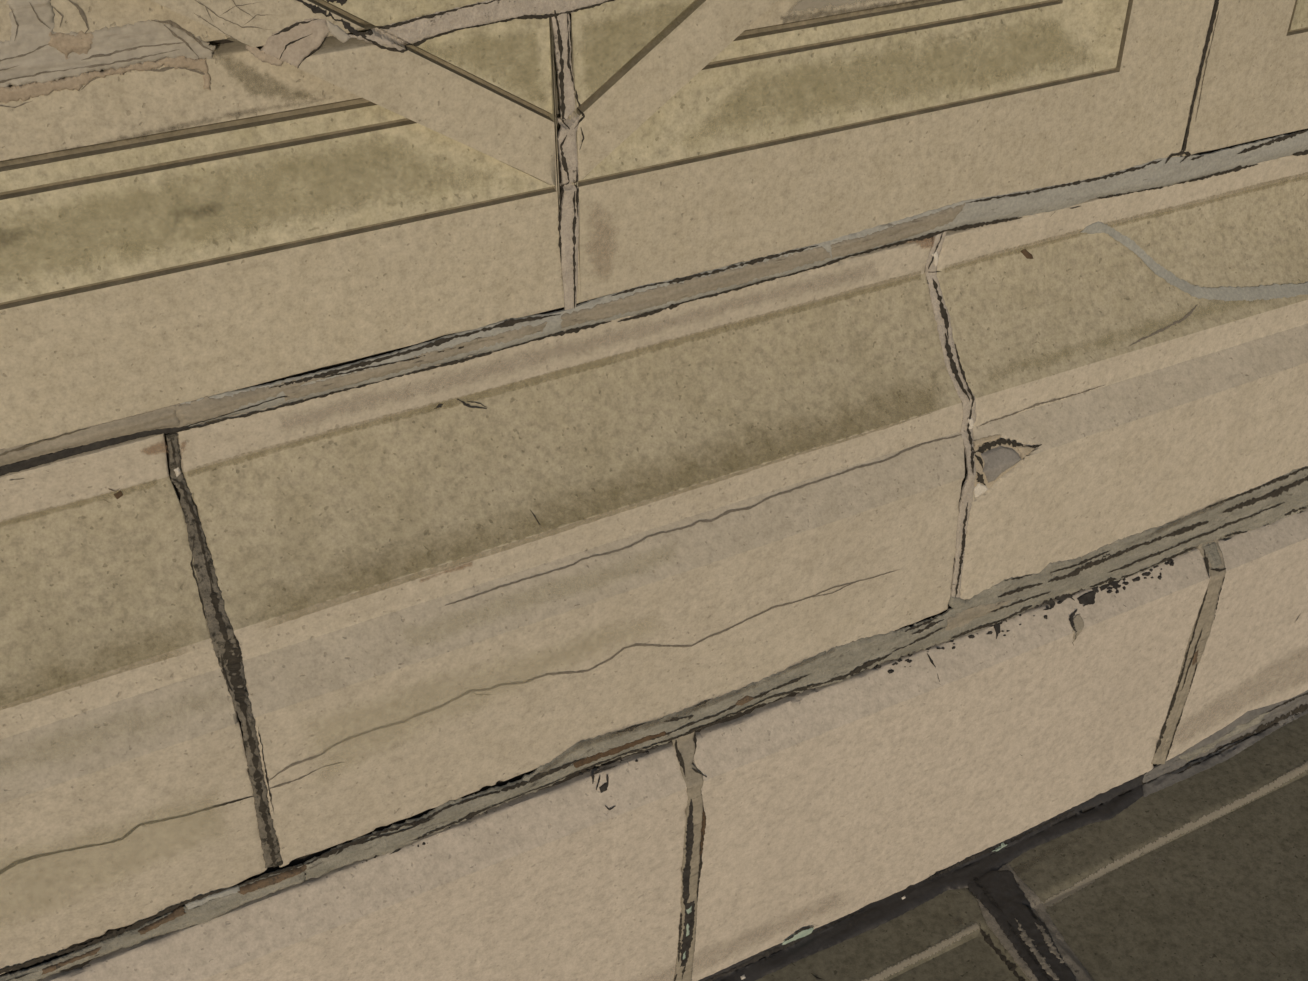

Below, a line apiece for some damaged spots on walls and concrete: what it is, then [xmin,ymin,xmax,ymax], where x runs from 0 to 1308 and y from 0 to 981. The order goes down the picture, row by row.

peeling [0,0,215,108]
crack [1081,221,1308,347]
crack [445,385,1104,606]
spalling [973,434,1042,498]
spalling [876,559,1174,684]
crack [0,570,897,874]
corrosion [138,906,186,935]
corrosion [237,864,307,895]